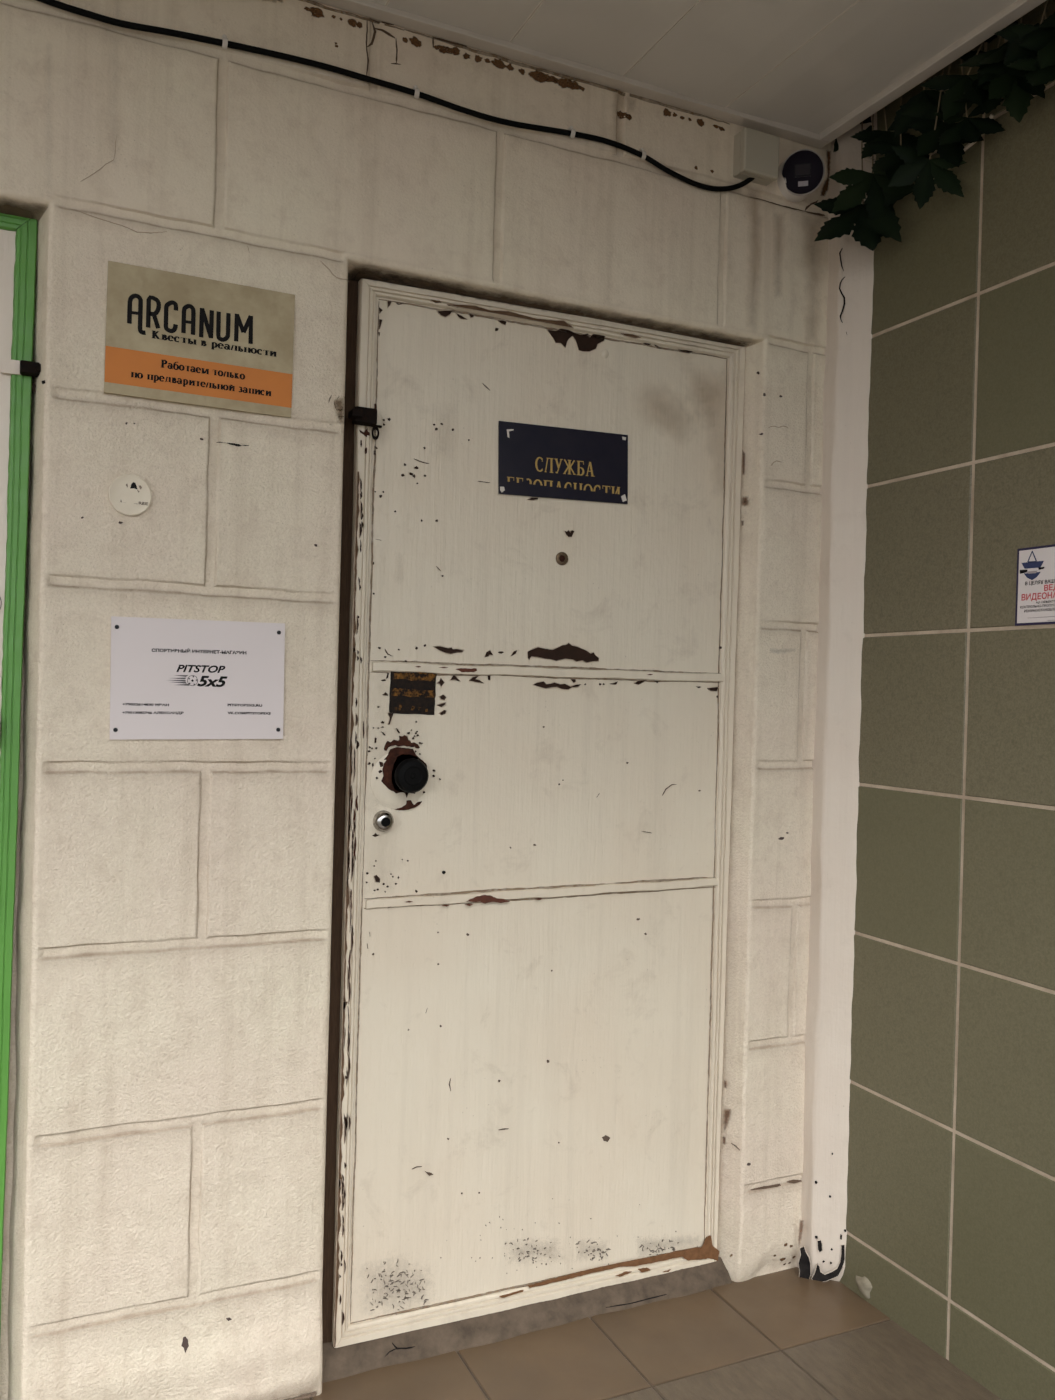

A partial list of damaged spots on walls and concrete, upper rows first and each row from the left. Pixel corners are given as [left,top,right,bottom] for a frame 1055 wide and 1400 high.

peeling [431,300,693,354]
corrosion [329,395,343,425]
peeling [533,674,658,690]
corrosion [343,281,740,1324]
peeling [285,471,599,1400]